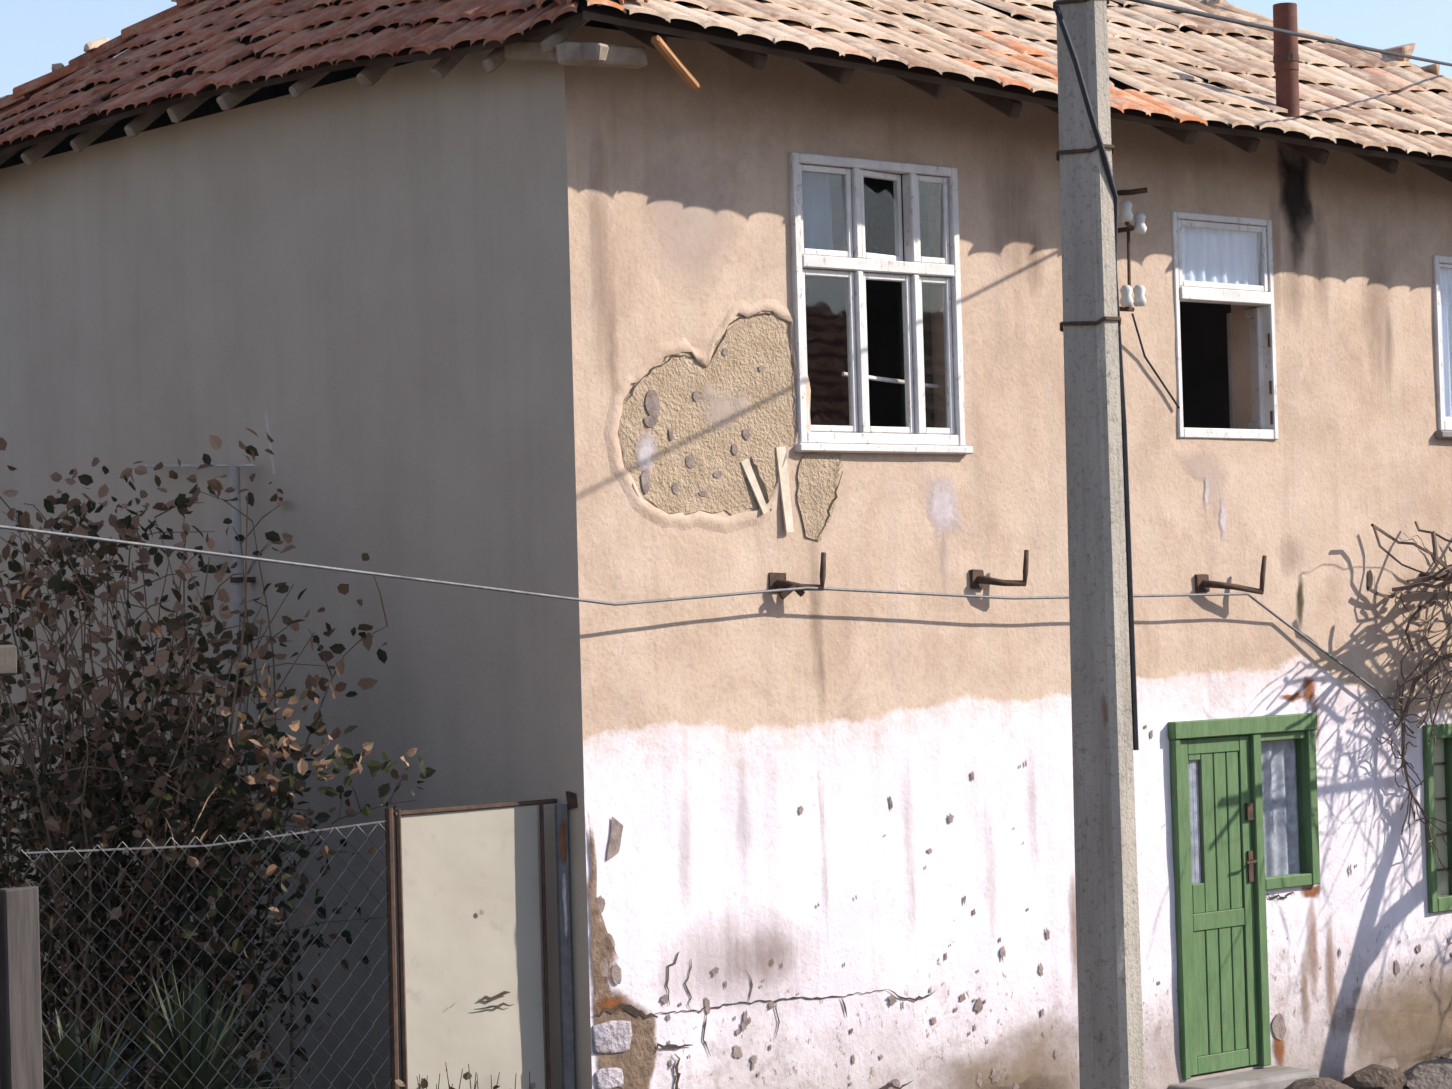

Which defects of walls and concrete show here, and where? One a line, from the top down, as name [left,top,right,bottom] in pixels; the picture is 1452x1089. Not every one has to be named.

peeling [603,298,843,541]
corrosion [1283,677,1319,733]
corrosion [1303,886,1320,897]
spalling [588,817,710,1089]
spalling [733,1010,772,1076]
crack [655,951,936,1056]
spalling [879,1079,912,1089]
spalling [954,993,988,1044]
corrosion [1303,925,1334,1017]
damp [1359,973,1452,1062]